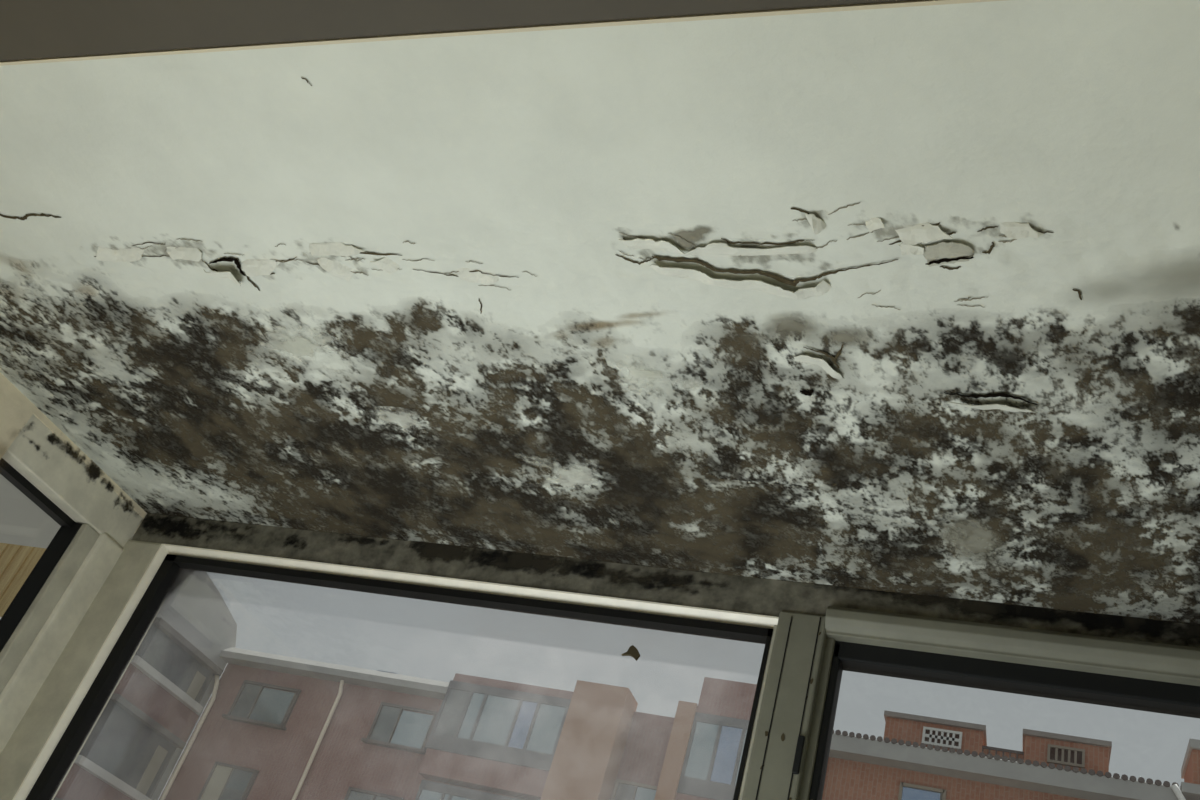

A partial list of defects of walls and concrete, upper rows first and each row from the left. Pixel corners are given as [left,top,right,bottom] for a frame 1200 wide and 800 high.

crack [0,212,61,220]
peeling [94,238,536,291]
peeling [615,203,956,300]
peeling [977,222,1054,254]
damp [0,278,1200,646]